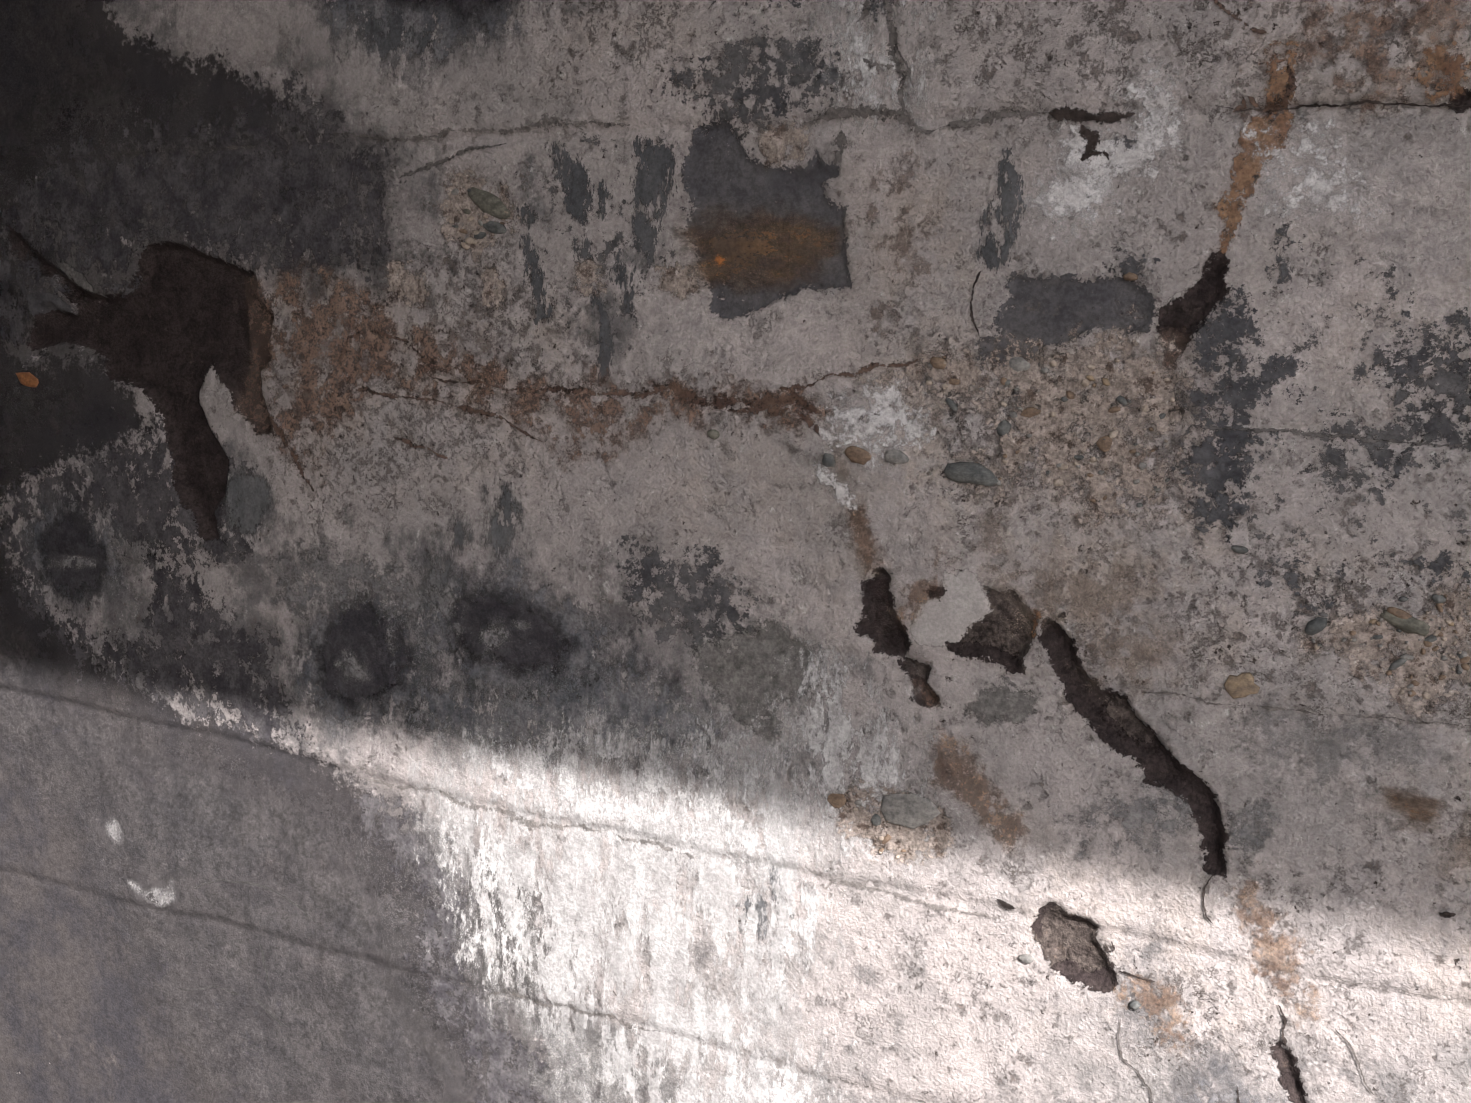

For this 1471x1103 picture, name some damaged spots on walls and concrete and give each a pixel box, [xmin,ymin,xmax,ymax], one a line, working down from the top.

leakage [314,0,523,83]
corrosion [1214,0,1471,254]
crack [1216,65,1471,113]
leakage [517,128,690,383]
spalling [8,224,275,542]
corrosion [257,260,834,487]
leakage [90,484,939,1103]
crack [360,777,705,864]
crack [811,872,1016,920]
spalling [1031,902,1119,993]
spalling [945,586,1230,924]
spalling [1269,1005,1308,1103]